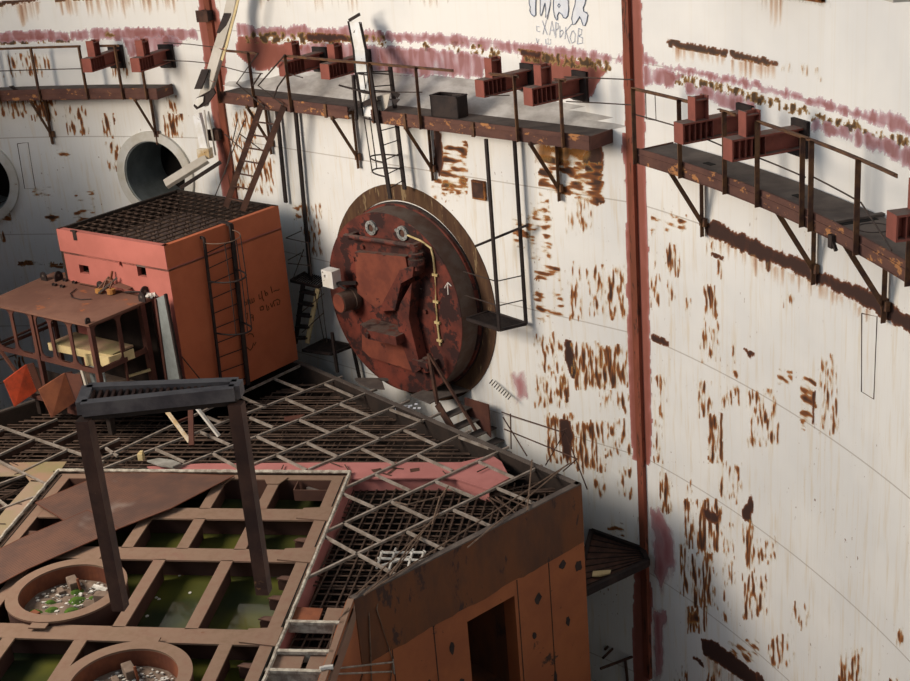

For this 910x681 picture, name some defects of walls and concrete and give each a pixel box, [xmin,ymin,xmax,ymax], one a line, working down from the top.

rust [666,39,778,72]
rust [163,95,183,138]
rust [673,72,910,148]
rust [434,131,468,202]
rust [526,144,625,321]
rust [702,219,910,361]
rust [534,331,630,497]
rust [651,375,670,514]
rust [800,354,837,435]
rust [680,380,788,681]
rust [838,654,859,681]